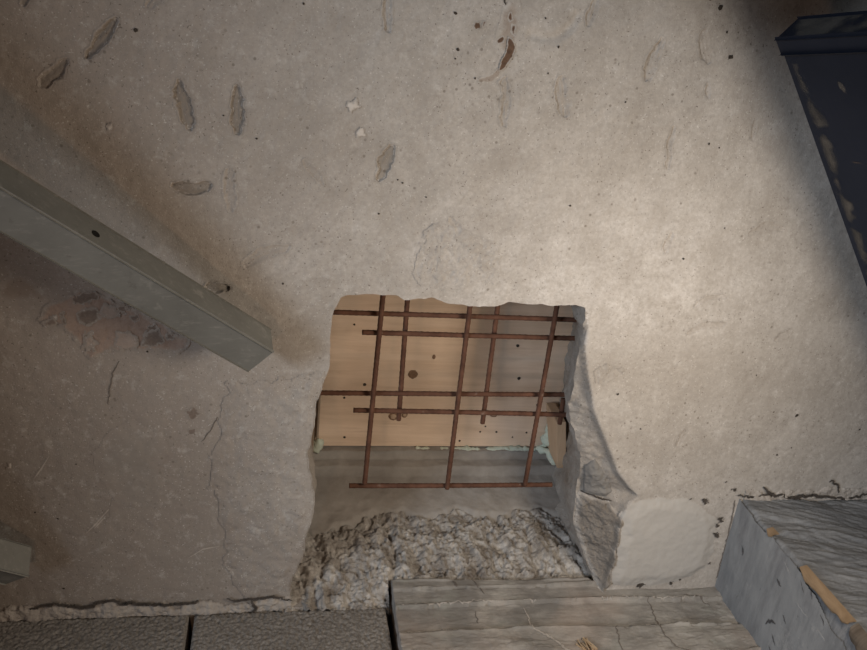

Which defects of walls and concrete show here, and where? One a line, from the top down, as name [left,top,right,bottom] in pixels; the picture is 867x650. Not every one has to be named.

corrosion [477,0,524,83]
spalling [170,77,197,134]
spalling [223,83,248,136]
spalling [374,143,403,184]
peeling [36,289,190,360]
spalling [207,295,624,616]
crack [716,480,867,578]
crack [29,599,198,610]
crack [227,595,293,613]